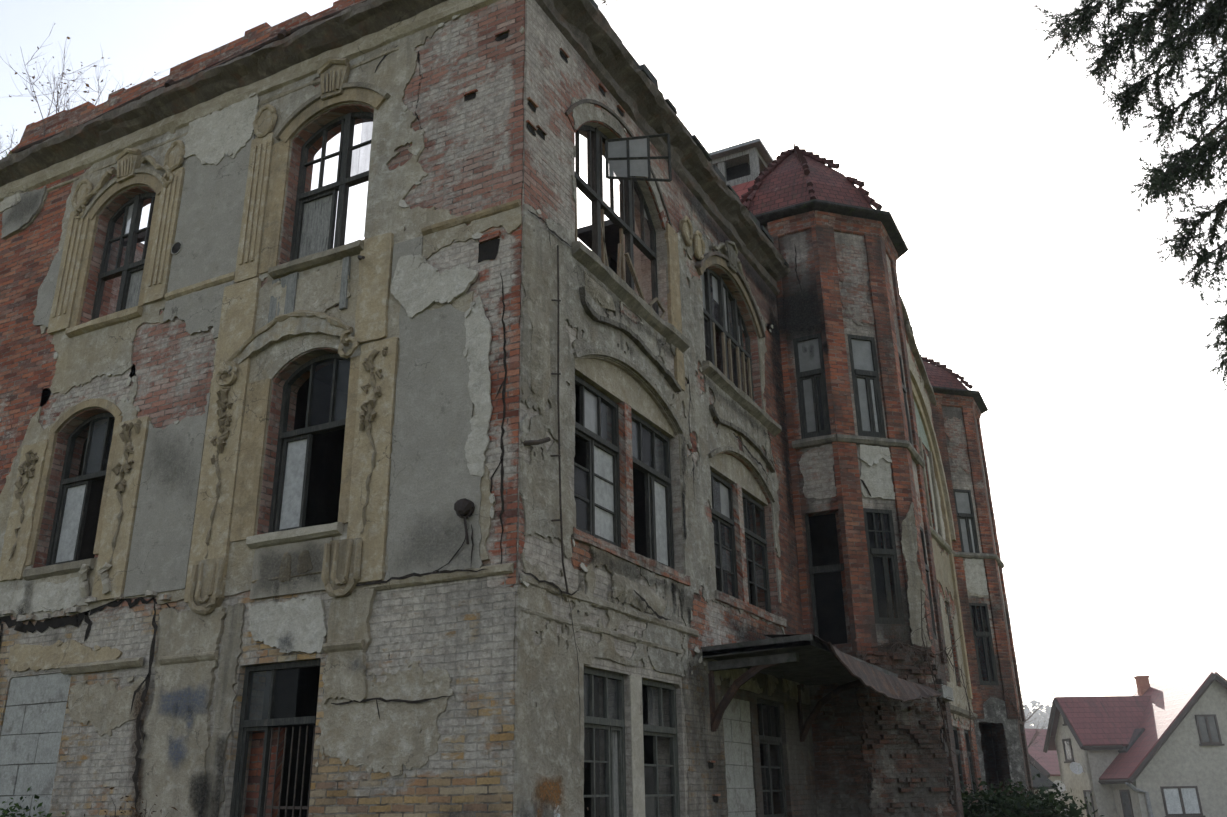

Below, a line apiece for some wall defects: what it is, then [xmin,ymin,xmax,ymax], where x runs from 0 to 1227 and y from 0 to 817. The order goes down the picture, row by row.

flaking render [12,577,90,615]
crack [0,590,175,817]
flaking render [0,167,216,494]
flaking render [249,595,328,654]
crack [331,695,454,719]
crack [356,273,580,751]
flaking render [390,0,804,817]
corrosion [765,634,943,703]
flaking render [859,444,892,466]
spalling [854,639,957,817]